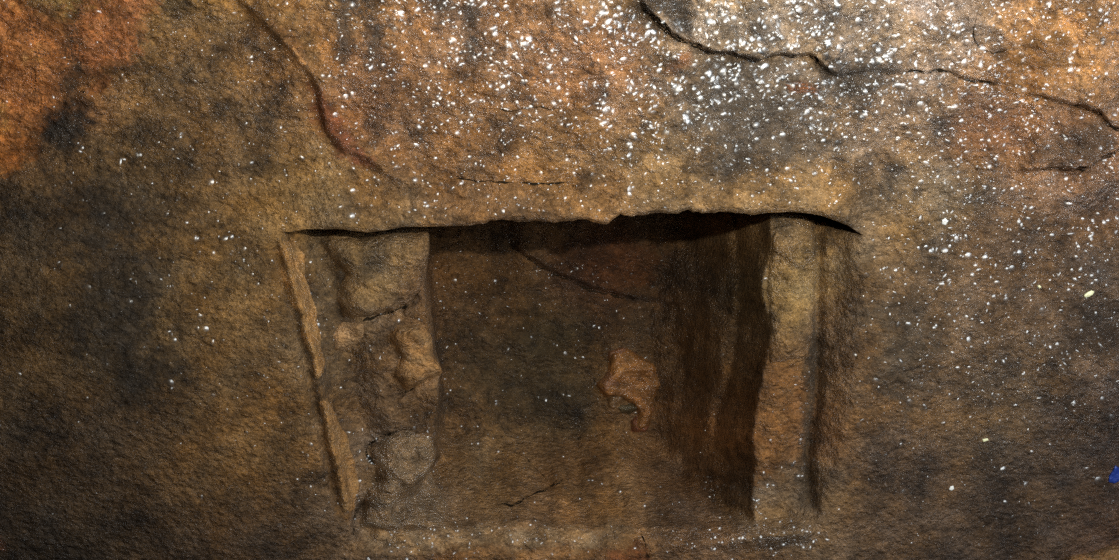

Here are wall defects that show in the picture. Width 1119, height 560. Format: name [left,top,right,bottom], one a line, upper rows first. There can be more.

crack [640,3,1008,88]
crack [484,105,561,113]
crack [1039,95,1119,172]